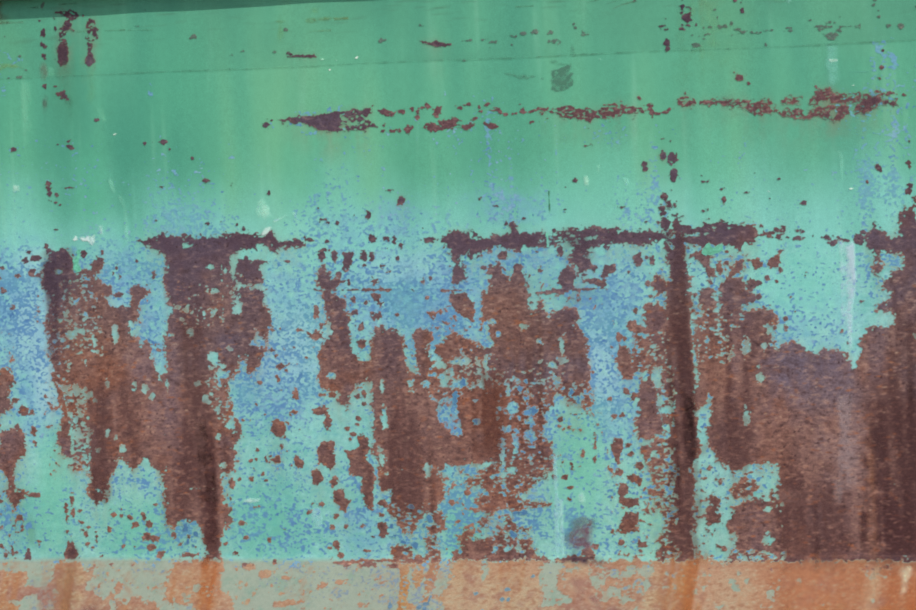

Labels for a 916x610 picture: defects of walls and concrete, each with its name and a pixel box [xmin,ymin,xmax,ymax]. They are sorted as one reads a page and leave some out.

rust [38,8,99,67]
rust [659,0,774,52]
rust [808,16,861,40]
rust [42,84,69,101]
rust [262,65,907,135]
peeling [208,37,916,610]
peeling [0,134,267,610]
rust [0,138,916,610]